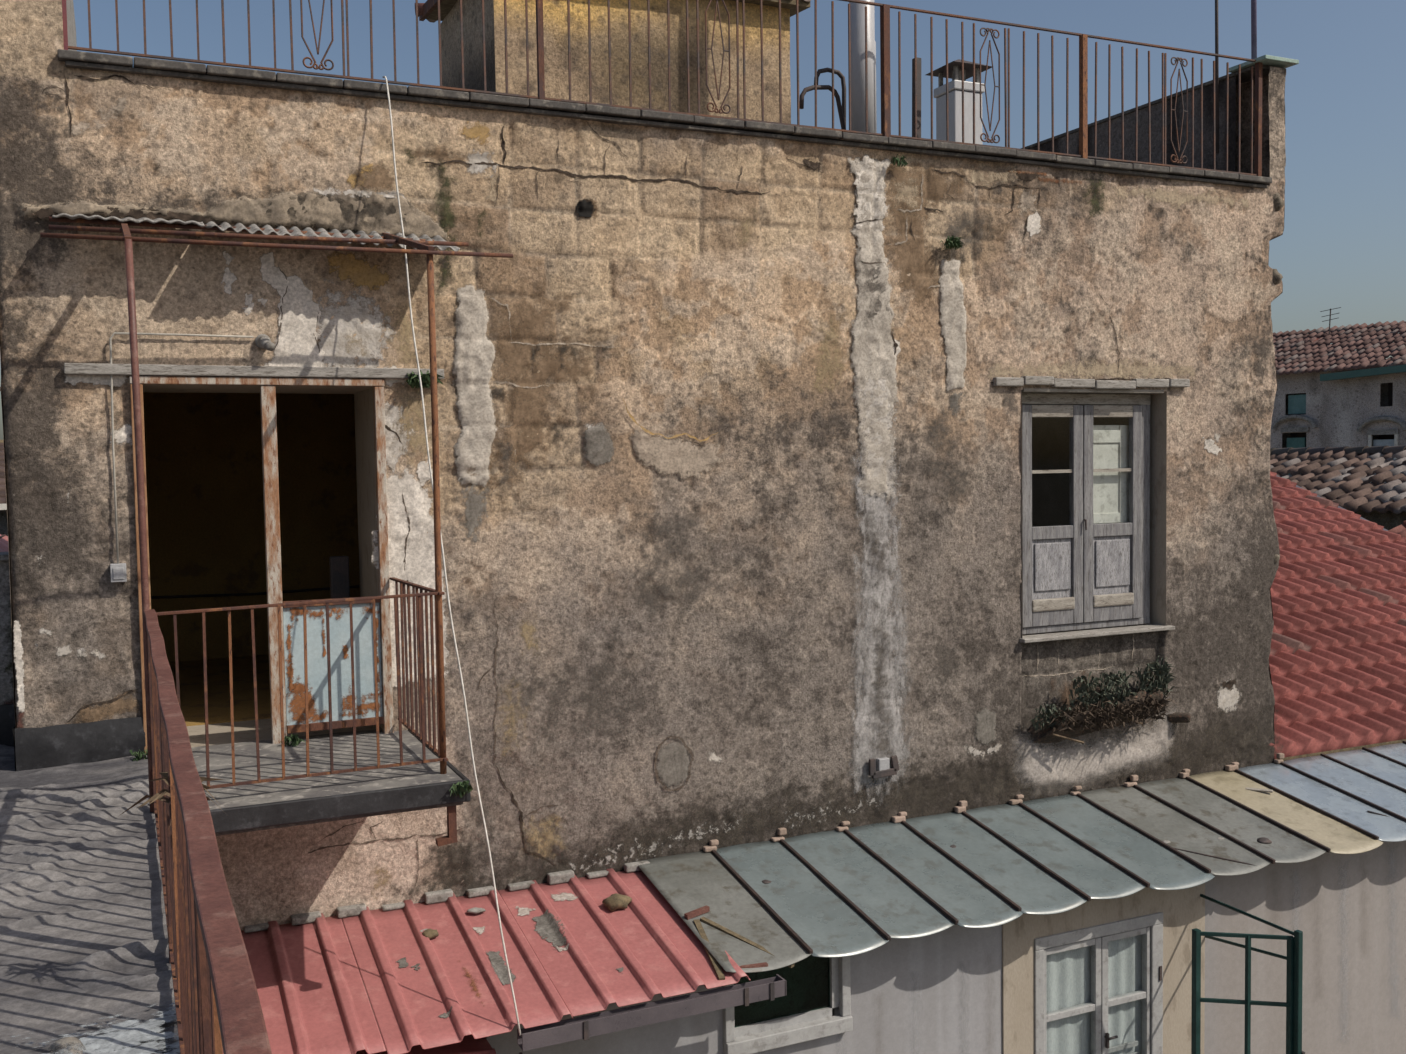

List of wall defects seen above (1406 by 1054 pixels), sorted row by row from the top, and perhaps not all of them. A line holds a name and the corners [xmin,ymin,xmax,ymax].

crack [422,121,769,207]
spalling [891,332,901,356]
flaking render [221,251,450,687]
damp [926,405,972,517]
damp [634,507,722,615]
rust [285,603,383,725]
crack [476,601,557,866]
spalling [1217,679,1242,712]
damp [375,708,1282,903]